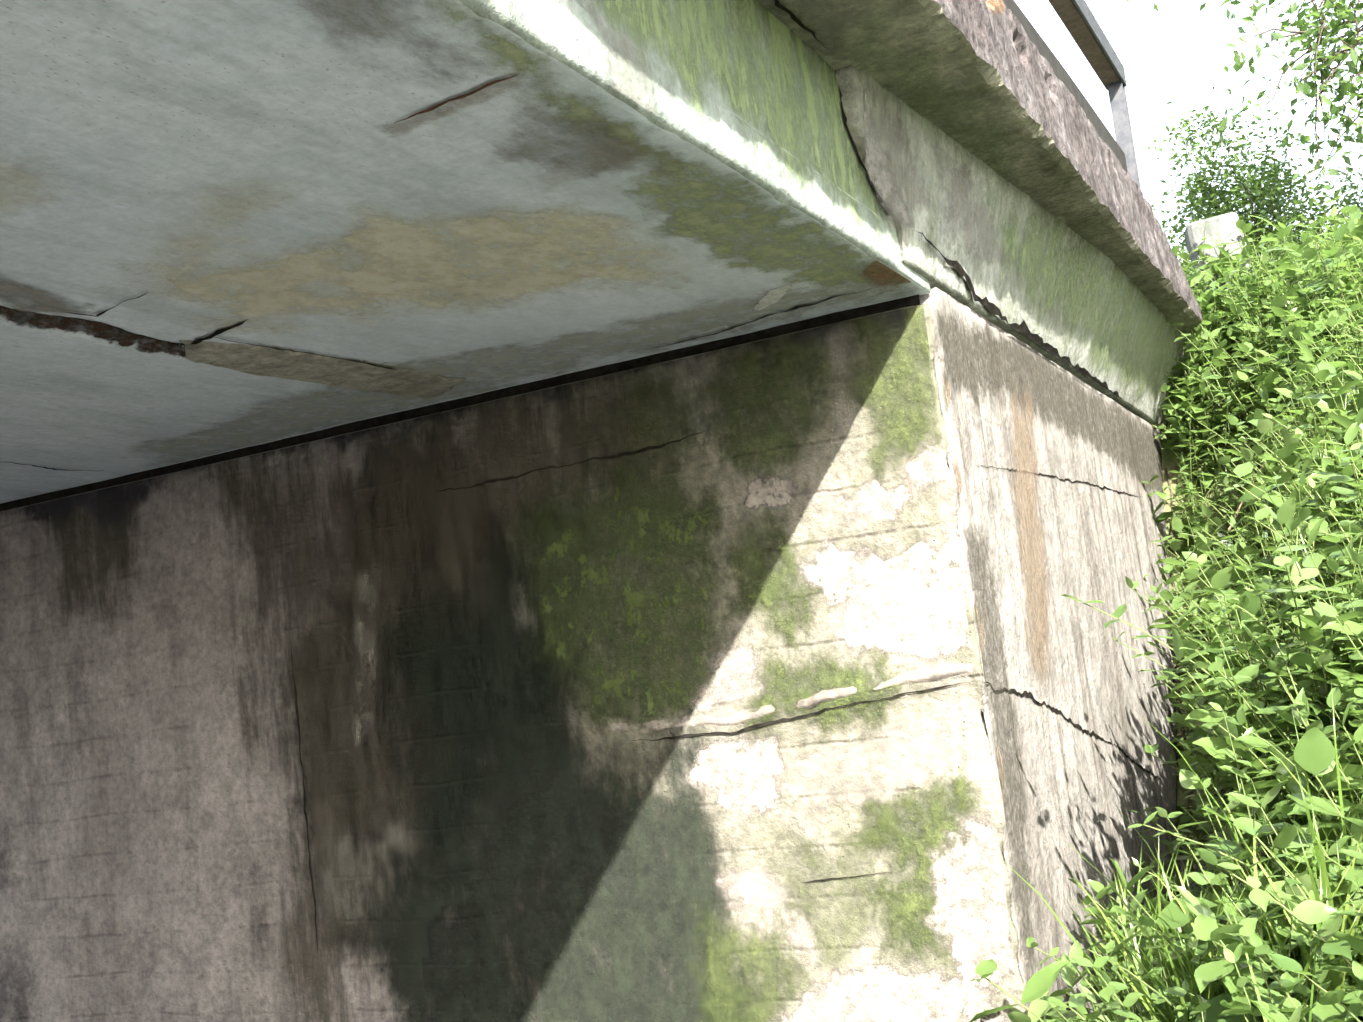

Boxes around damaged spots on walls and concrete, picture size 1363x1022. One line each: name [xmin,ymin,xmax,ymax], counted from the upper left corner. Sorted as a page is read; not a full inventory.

crack [774,0,1138,410]
leakage [167,210,664,330]
crack [645,287,878,350]
rust [862,260,911,288]
peeling [835,445,962,521]
crack [980,465,1143,498]
leakage [25,477,159,617]
peeling [800,524,983,659]
leakage [139,285,905,1022]
peeling [679,644,764,712]
peeling [685,734,788,815]
crack [630,667,1162,781]